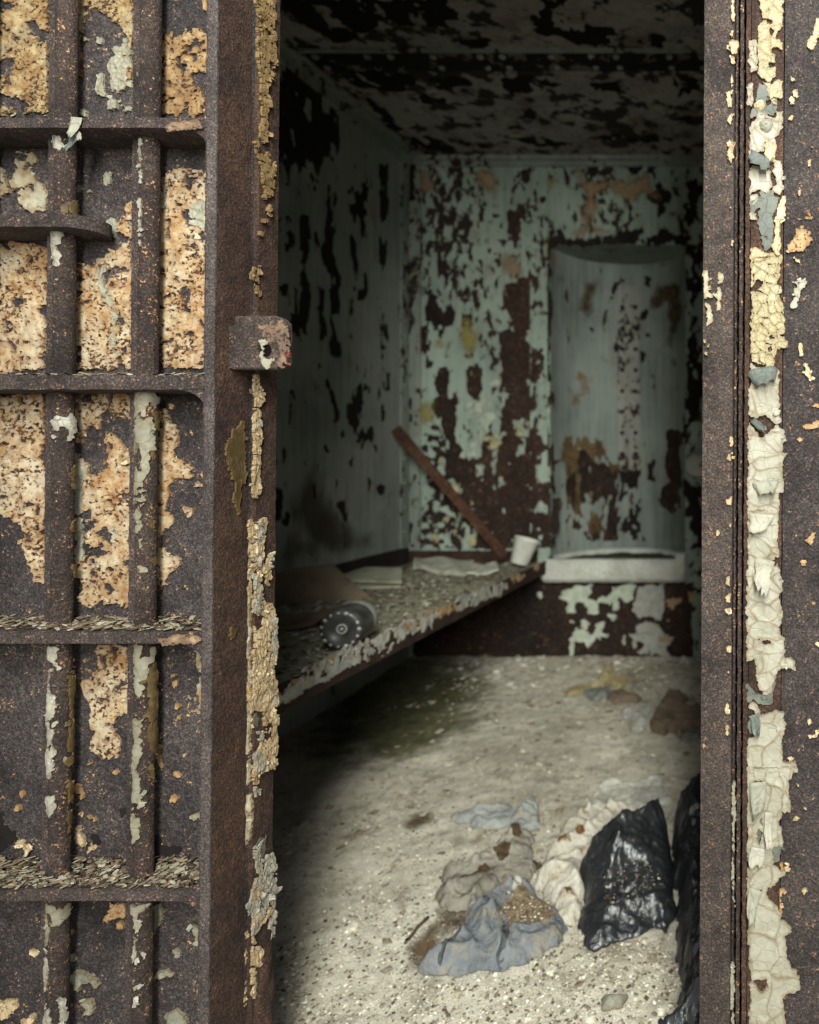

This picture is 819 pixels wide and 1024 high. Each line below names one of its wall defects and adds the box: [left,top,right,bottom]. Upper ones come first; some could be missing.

peeling [0,0,50,117]
peeling [78,0,134,113]
peeling [161,28,207,132]
peeling [0,231,64,373]
peeling [76,198,144,371]
peeling [159,167,206,370]
rust [257,319,291,368]
peeling [409,167,724,551]
peeling [0,391,203,614]
peeling [725,0,819,1024]
peeling [44,632,202,857]
peeling [225,362,696,1007]